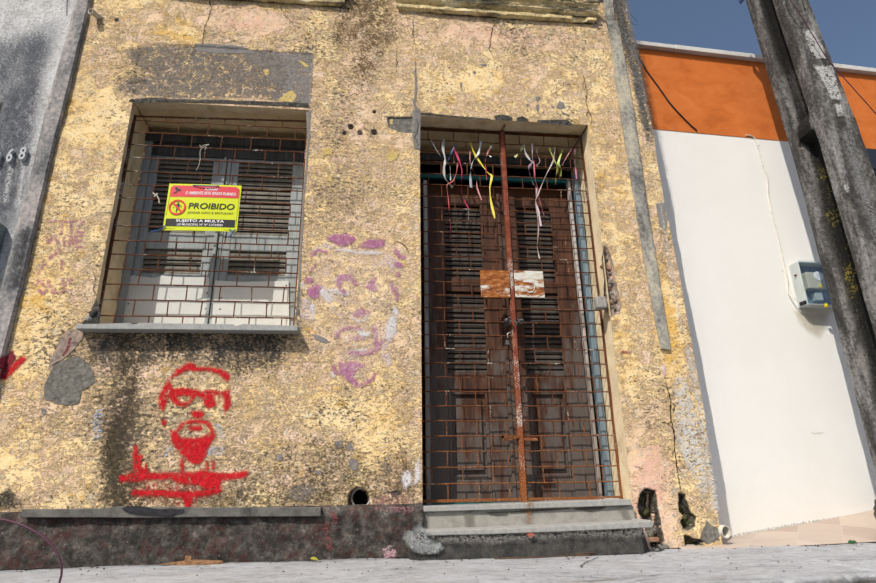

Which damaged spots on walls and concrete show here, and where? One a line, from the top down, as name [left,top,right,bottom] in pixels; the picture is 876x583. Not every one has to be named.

damp [336,0,398,94]
flaking render [118,44,314,330]
spalling [594,246,621,317]
damp [81,332,294,507]
damp [252,444,379,504]
spalling [638,489,664,548]
crack [660,376,682,492]
spalling [678,493,704,546]